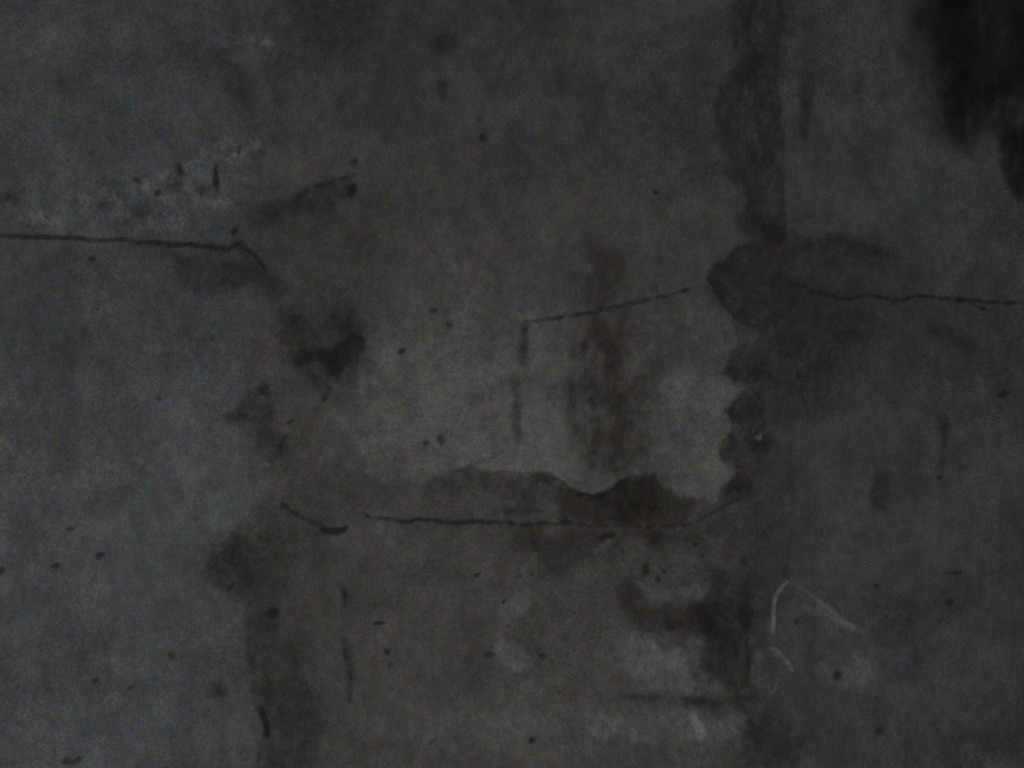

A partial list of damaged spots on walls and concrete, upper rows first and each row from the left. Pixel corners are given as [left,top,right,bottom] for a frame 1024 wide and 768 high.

water stain [918,0,1024,118]
crack [0,228,264,268]
crack [282,504,540,535]